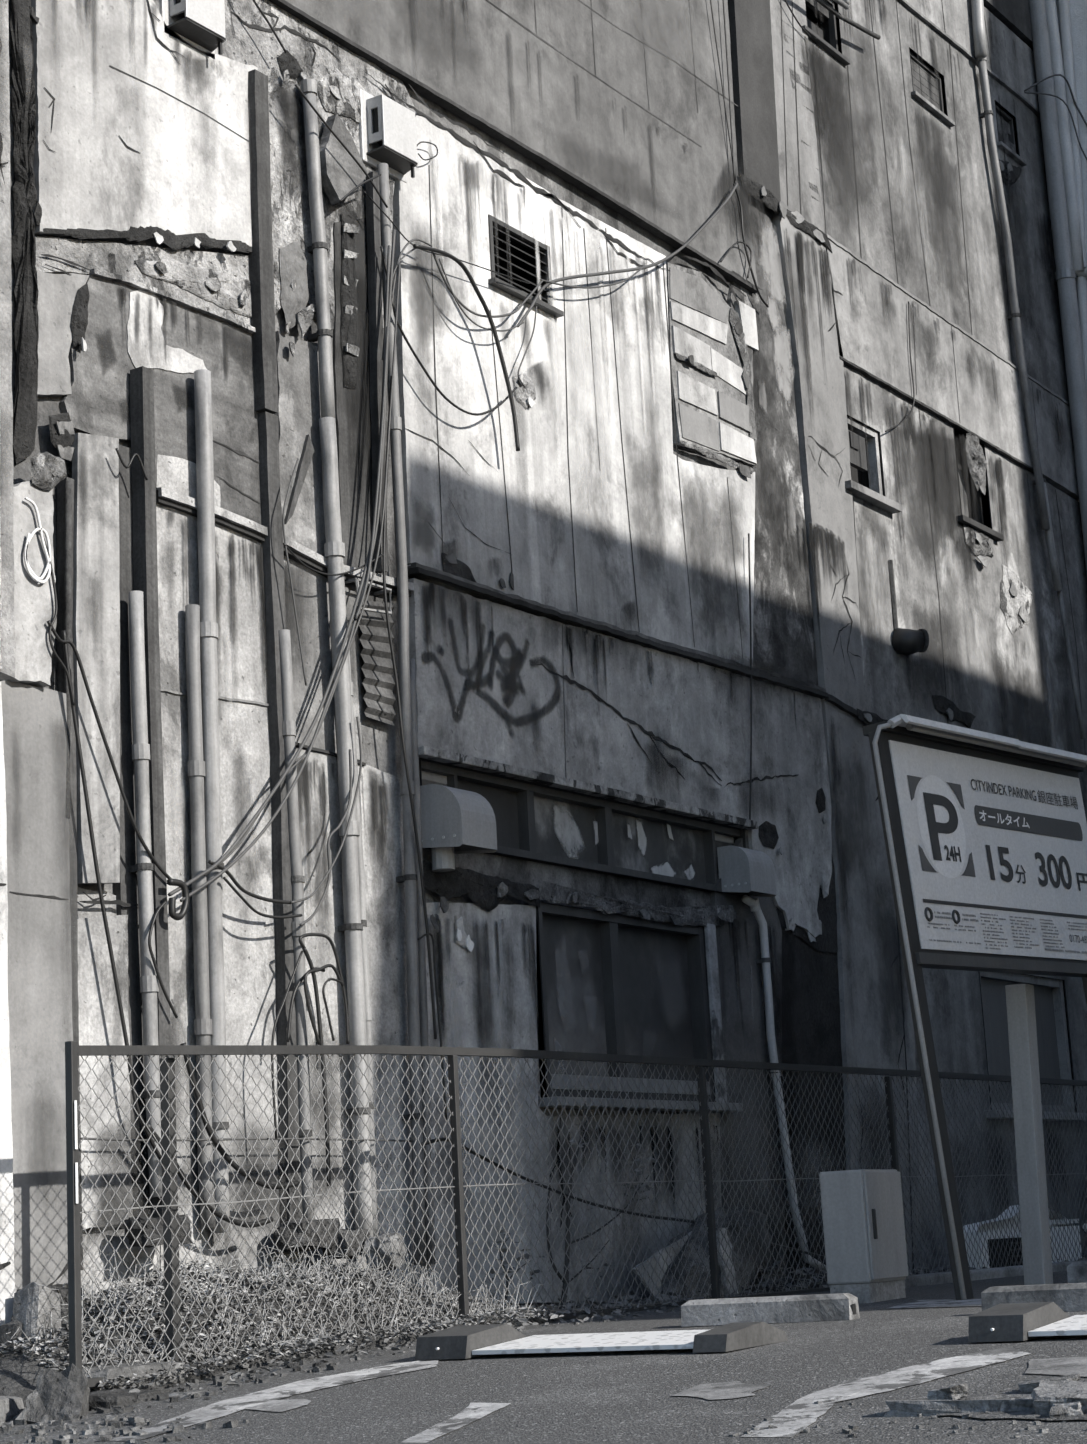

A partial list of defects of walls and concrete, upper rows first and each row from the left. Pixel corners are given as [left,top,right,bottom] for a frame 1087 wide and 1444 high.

spalling [278,50,368,123]
water stain [917,116,959,266]
water stain [978,74,1030,320]
spalling [40,226,253,318]
water stain [785,229,832,391]
water stain [1041,215,1062,335]
water stain [764,465,847,626]
crack [831,556,860,680]
peeling [963,524,1032,634]
crack [529,635,799,786]
spalling [423,860,739,952]
peeling [776,857,838,953]